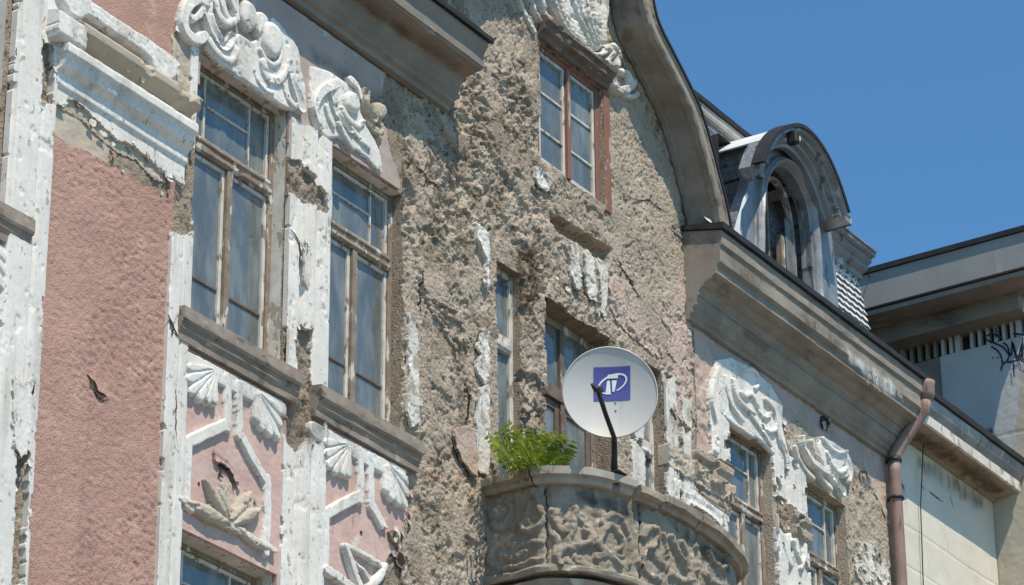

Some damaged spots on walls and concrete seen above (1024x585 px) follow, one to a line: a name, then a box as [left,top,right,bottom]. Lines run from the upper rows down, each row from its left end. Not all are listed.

flaking render [170,26,195,92]
flaking render [40,41,194,237]
flaking render [284,156,330,213]
crack [627,194,667,213]
flaking render [273,321,327,452]
peeling [11,376,34,585]
flaking render [212,449,260,527]
crack [542,488,550,562]